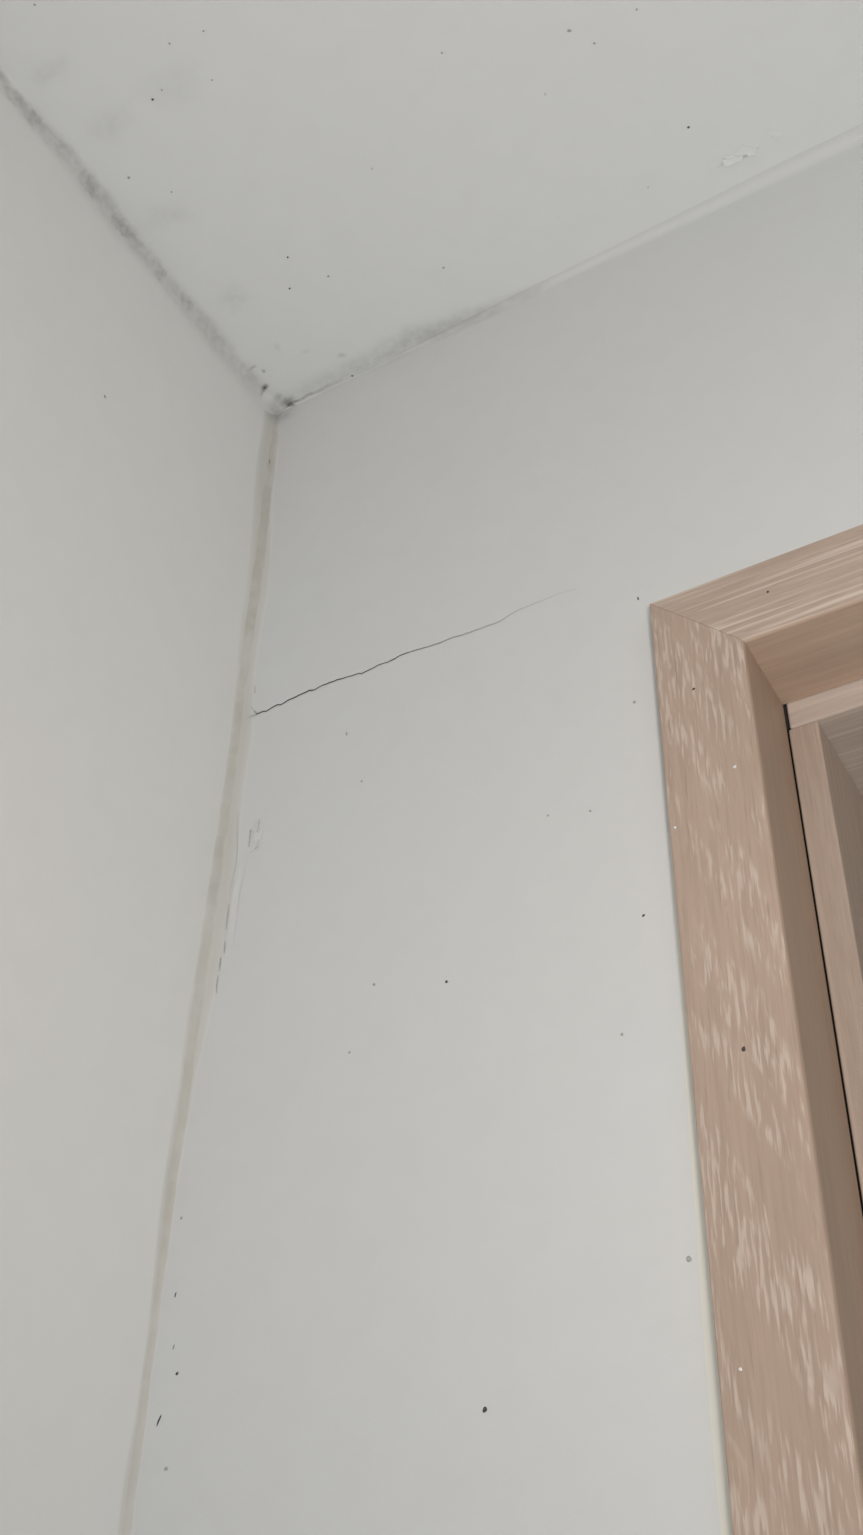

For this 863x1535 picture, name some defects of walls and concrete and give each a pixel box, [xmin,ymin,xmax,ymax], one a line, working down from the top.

crack [256,635,461,715]